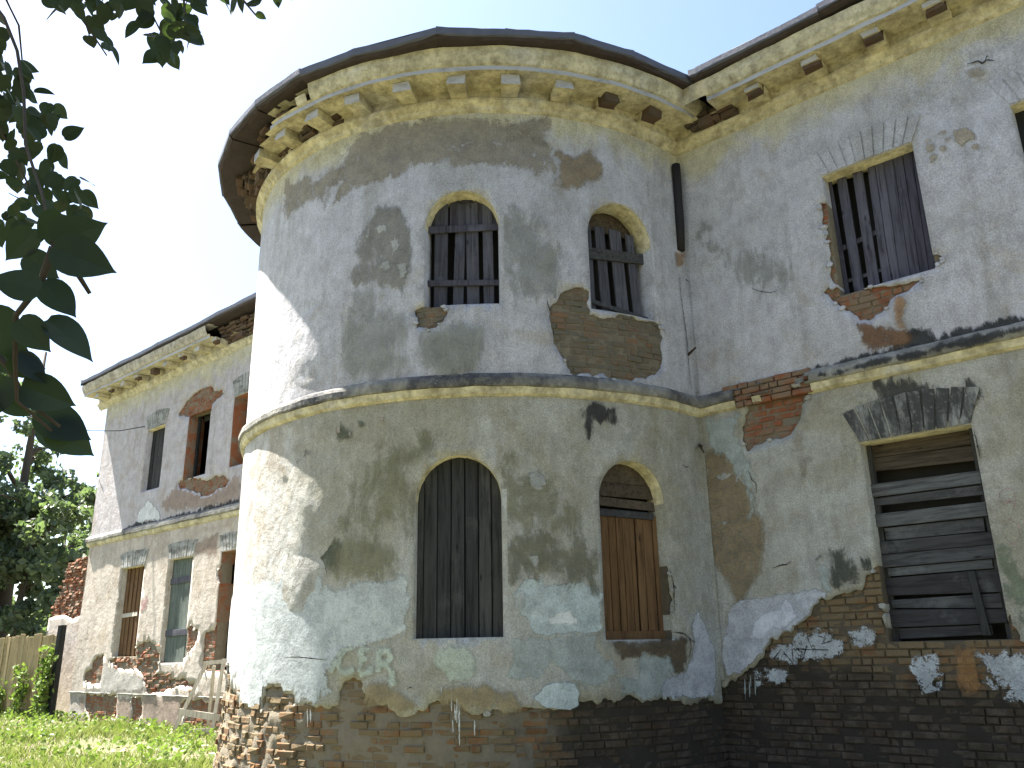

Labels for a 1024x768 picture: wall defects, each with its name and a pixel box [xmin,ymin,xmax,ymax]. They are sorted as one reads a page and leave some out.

damp [284,115,602,218]
damp [351,205,411,292]
flaking render [817,204,923,320]
flaking render [549,287,665,381]
flaking render [722,368,813,452]
flaking render [48,557,88,620]
flaking render [179,475,229,496]
damp [320,539,393,576]
damp [502,456,599,592]
damp [705,450,765,603]
damp [817,550,872,592]
flaking render [84,563,1024,768]